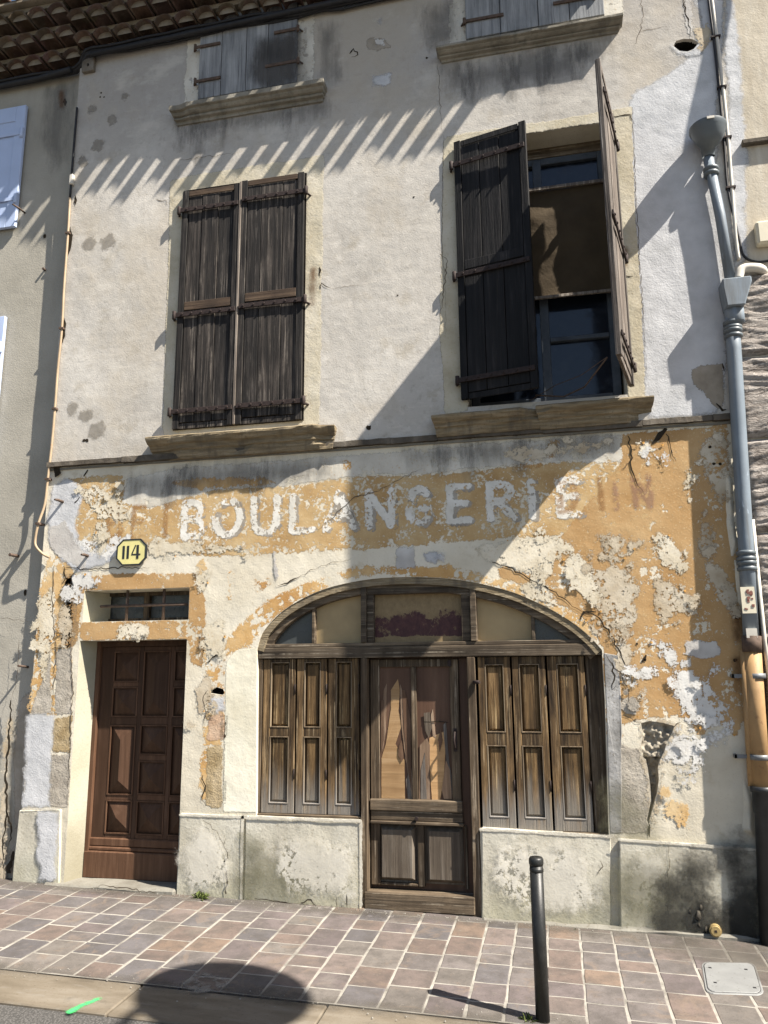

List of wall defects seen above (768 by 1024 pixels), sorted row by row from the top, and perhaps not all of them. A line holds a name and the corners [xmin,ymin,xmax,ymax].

damp [82,233,115,250]
damp [67,402,106,439]
peeling [72,470,135,555]
crack [623,436,644,494]
crack [0,647,19,879]
peeling [29,568,102,808]
crack [1,566,141,806]
peeling [116,622,150,642]
flaking render [185,618,227,808]
crack [493,562,630,710]
peeling [475,428,742,837]
damp [630,833,759,939]